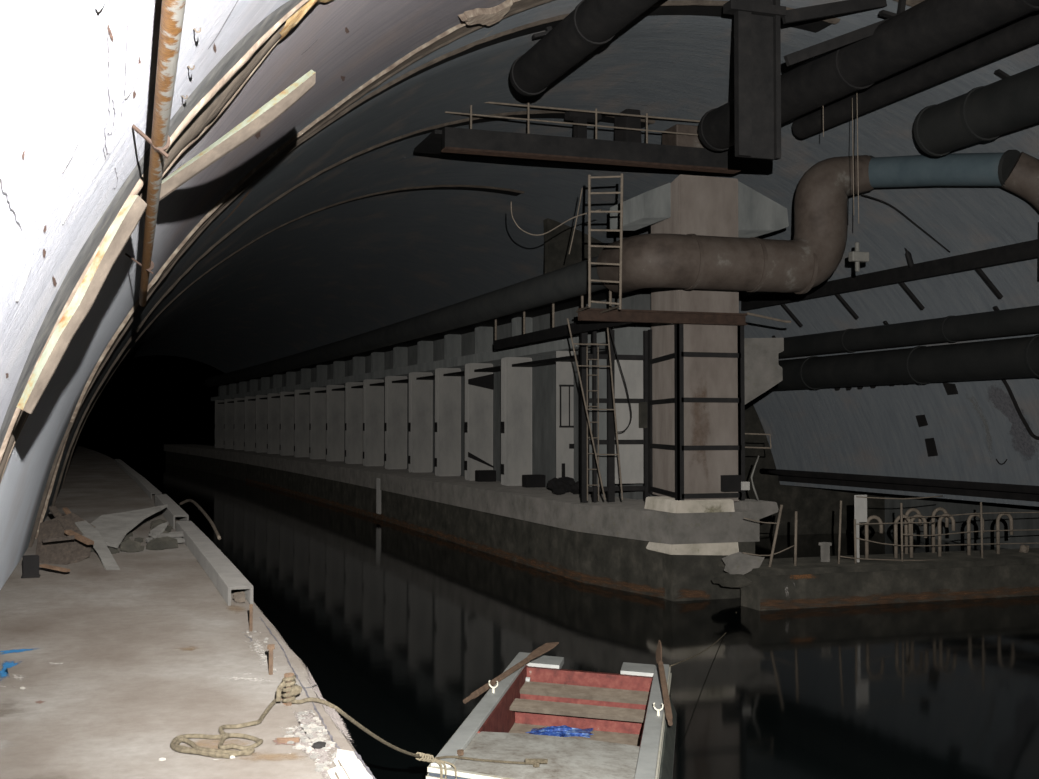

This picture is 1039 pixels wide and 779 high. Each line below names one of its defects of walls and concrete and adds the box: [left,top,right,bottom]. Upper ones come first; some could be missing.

crack [103,0,128,190]